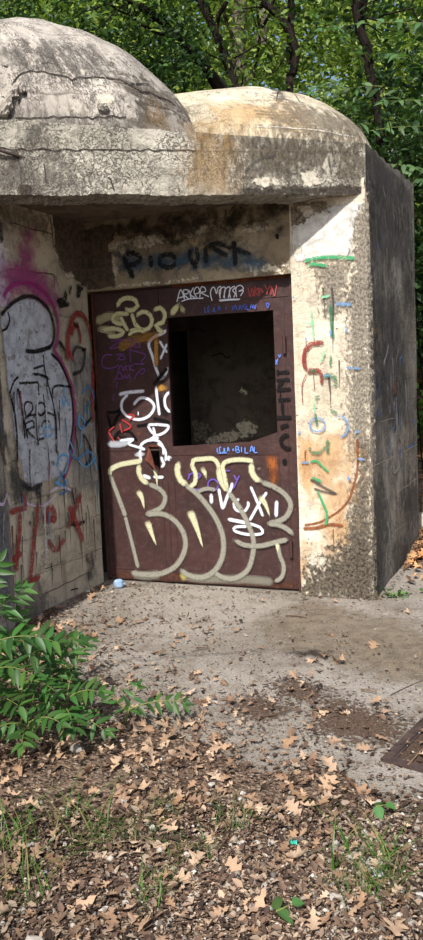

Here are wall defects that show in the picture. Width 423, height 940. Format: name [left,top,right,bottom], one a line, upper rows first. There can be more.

crack [3,62,135,85]
water stain [36,43,109,78]
water stain [113,203,289,259]
water stain [221,89,415,457]
peeling [238,167,378,600]
peeling [192,419,258,444]
water stain [373,466,418,596]